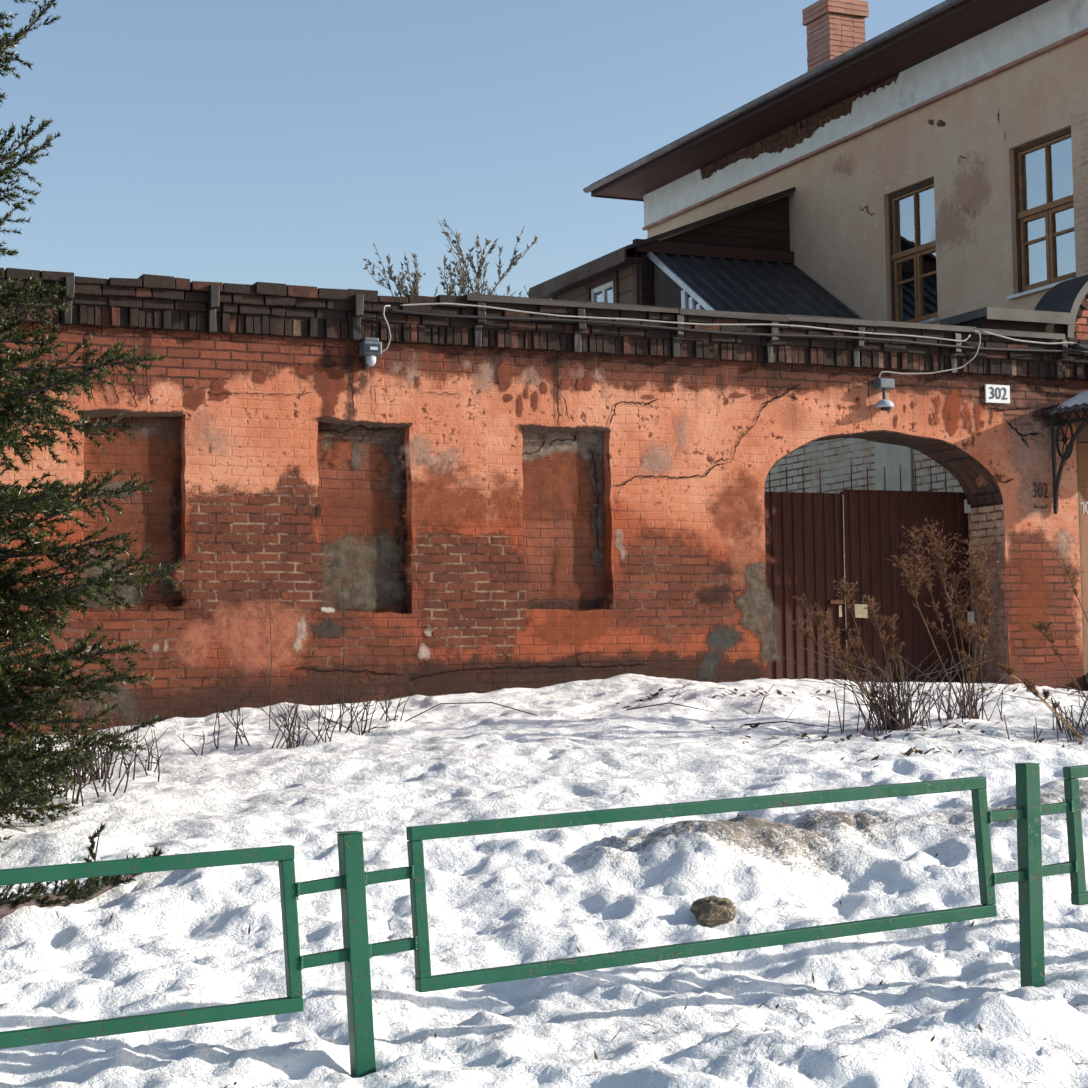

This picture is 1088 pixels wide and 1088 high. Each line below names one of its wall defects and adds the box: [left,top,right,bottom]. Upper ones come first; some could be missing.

flaking render [701,75,899,179]
flaking render [1,322,413,480]
crack [522,362,804,551]
flaking render [10,465,767,734]
flaking render [1001,530,1081,668]